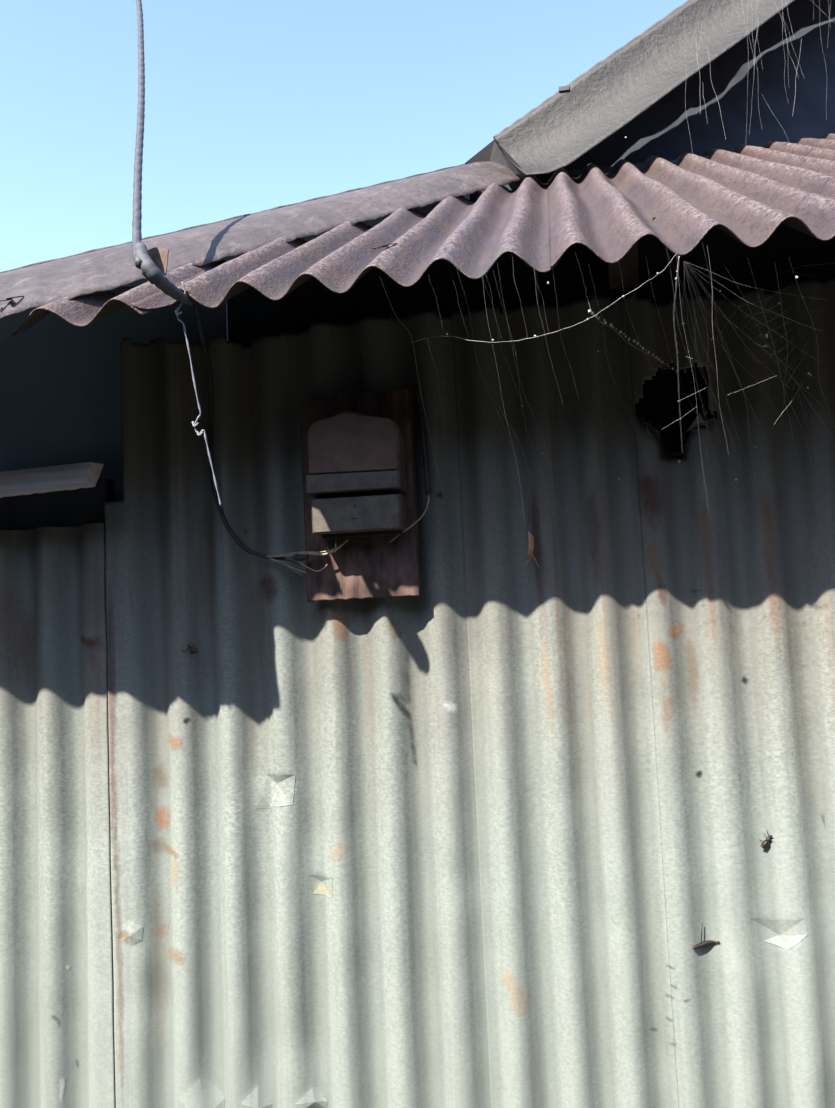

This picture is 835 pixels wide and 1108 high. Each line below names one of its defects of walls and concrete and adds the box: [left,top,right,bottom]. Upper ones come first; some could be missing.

spalling [636,366,716,457]